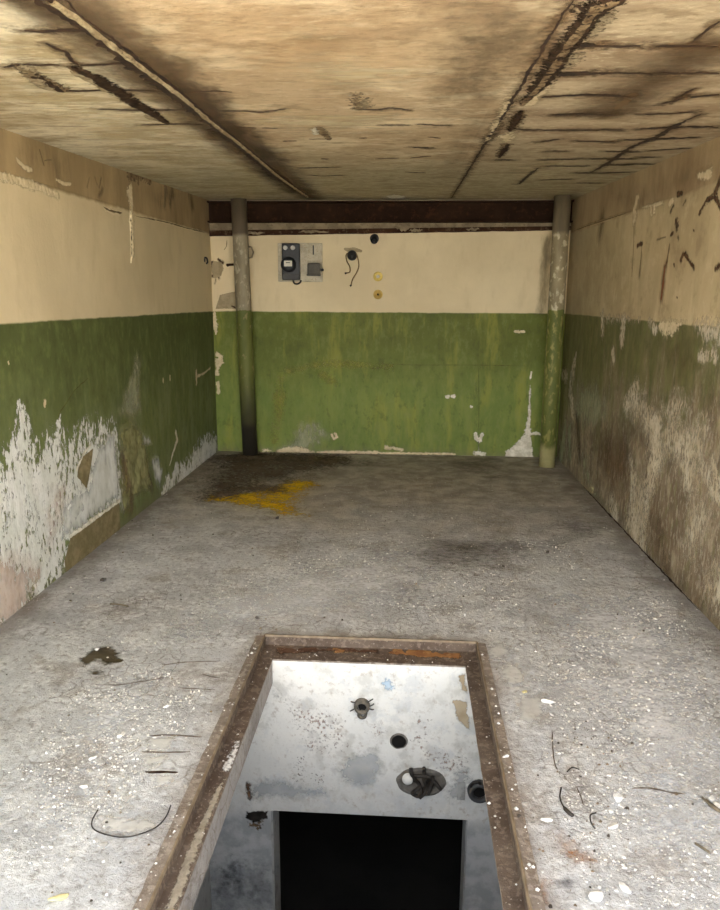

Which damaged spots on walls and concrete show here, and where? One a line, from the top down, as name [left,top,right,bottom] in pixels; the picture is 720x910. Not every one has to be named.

crack [2,0,339,199]
crack [450,0,720,198]
peeling [600,309,720,366]
peeling [195,352,224,395]
peeling [505,371,541,457]
flaking render [76,443,93,488]
flaking render [65,498,120,572]
leakage [79,647,123,675]
rust [276,647,462,659]